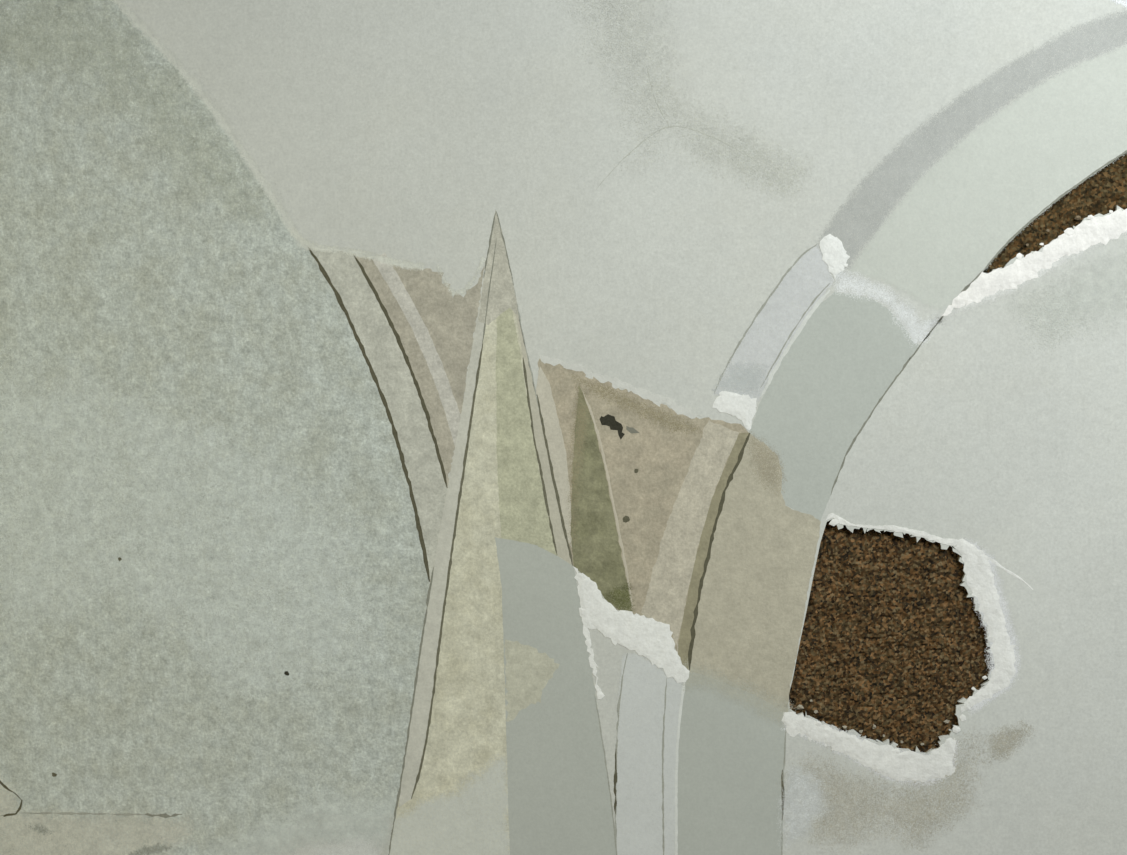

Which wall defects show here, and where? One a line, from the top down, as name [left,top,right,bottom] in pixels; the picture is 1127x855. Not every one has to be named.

spalling [937,150,1127,326]
spalling [600,414,639,439]
spalling [781,513,1033,788]